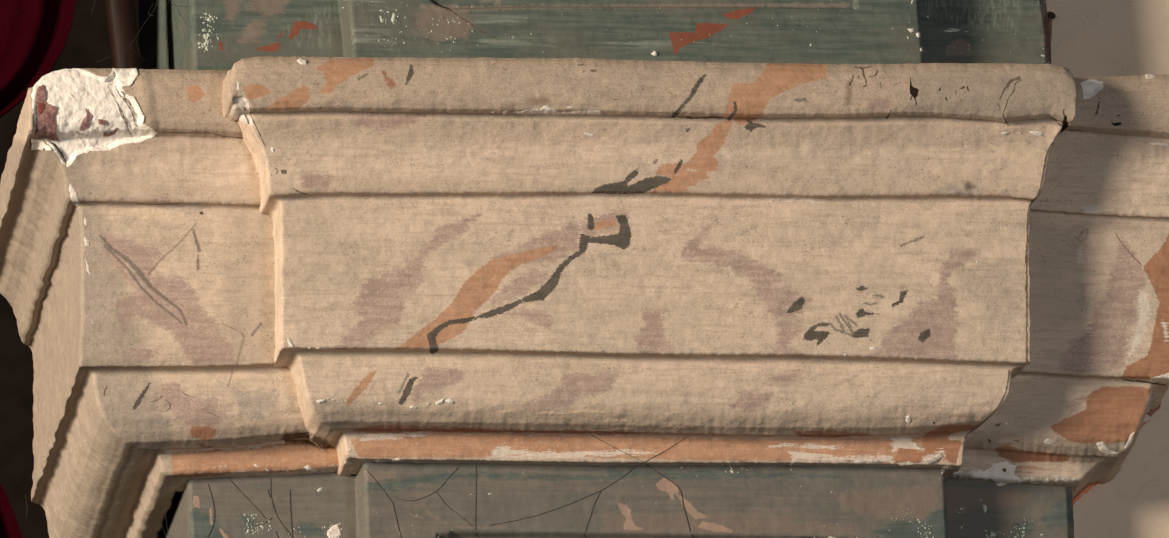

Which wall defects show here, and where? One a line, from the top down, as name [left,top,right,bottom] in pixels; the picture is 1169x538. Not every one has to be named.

spalling [31,68,157,168]
crack [964,108,1083,438]
peeling [1096,372,1169,455]